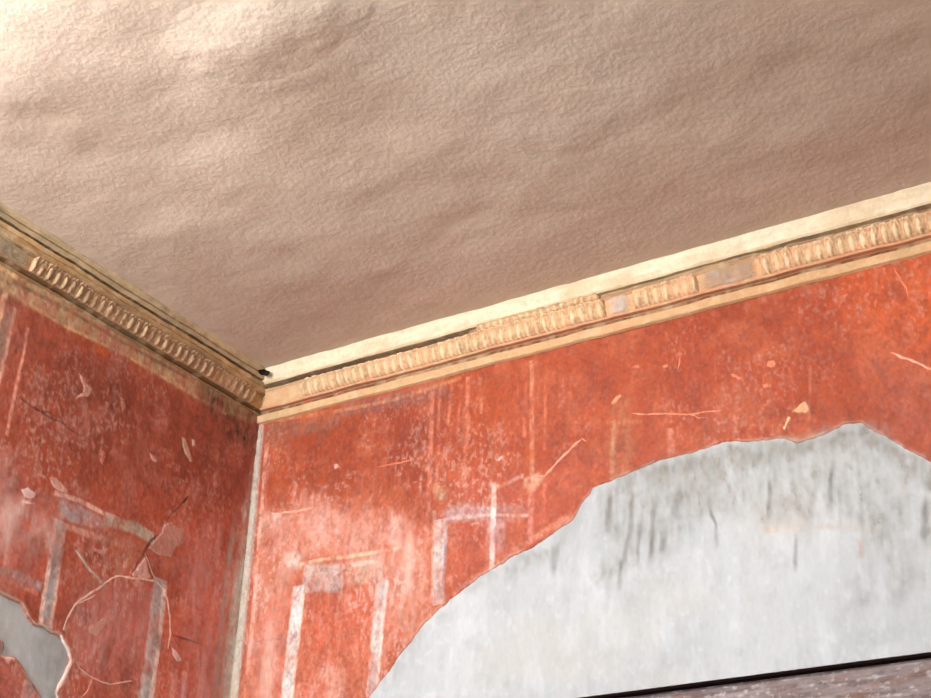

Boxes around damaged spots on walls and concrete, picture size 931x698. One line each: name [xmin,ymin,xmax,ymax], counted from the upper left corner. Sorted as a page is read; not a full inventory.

crack [63,550,169,630]
flaking render [369,417,931,698]
flaking render [0,595,72,698]